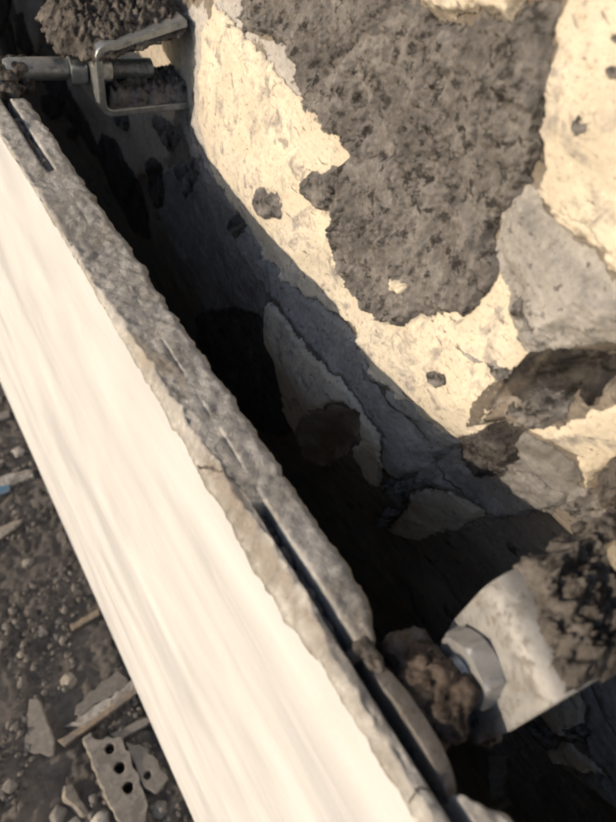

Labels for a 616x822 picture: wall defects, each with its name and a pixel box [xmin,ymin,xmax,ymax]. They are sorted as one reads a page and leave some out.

spalling [466,379,521,427]
crack [197,465,251,500]